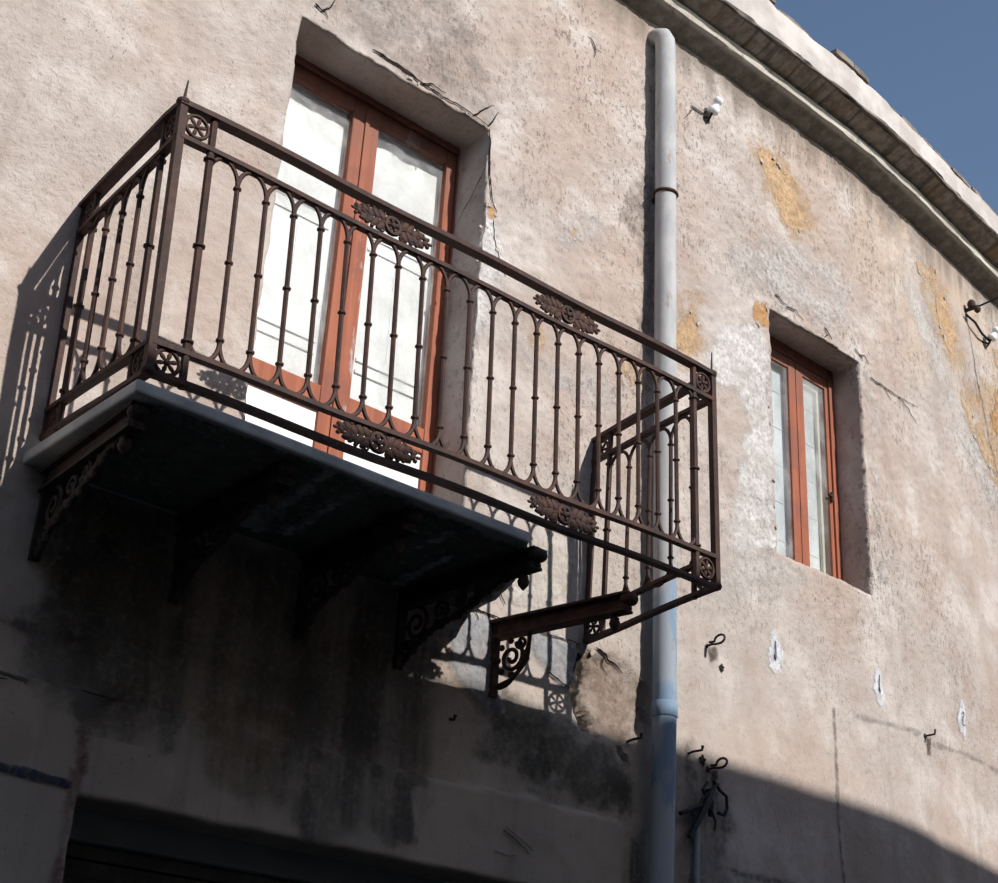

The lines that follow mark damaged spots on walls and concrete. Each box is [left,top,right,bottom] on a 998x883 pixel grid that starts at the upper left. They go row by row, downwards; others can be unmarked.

crack [372,49,506,277]
peeling [758,149,805,233]
peeling [962,396,998,486]
damp [90,406,520,588]
spalling [569,648,644,754]